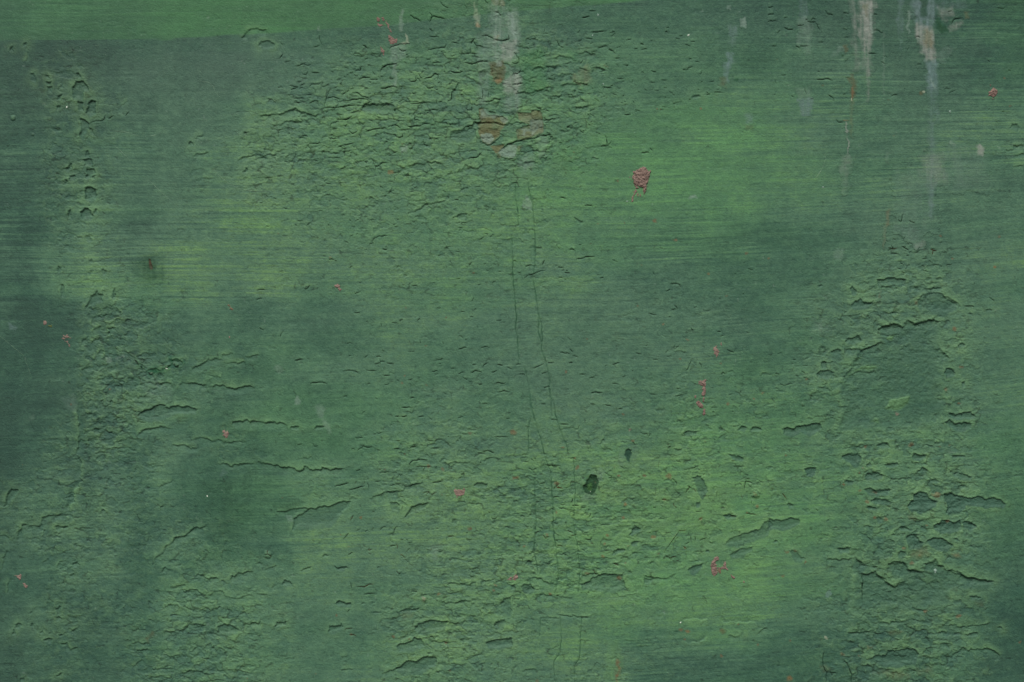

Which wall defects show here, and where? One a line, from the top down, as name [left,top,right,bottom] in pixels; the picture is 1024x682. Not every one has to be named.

peeling [69,70,100,225]
peeling [463,106,551,161]
water stain [847,0,994,250]
peeling [123,336,325,455]
peeling [257,454,347,482]
peeling [276,479,432,534]
crack [260,0,760,682]
peeling [327,500,802,679]
peeling [580,472,601,497]
peeling [781,274,979,440]
peeling [825,451,1009,612]